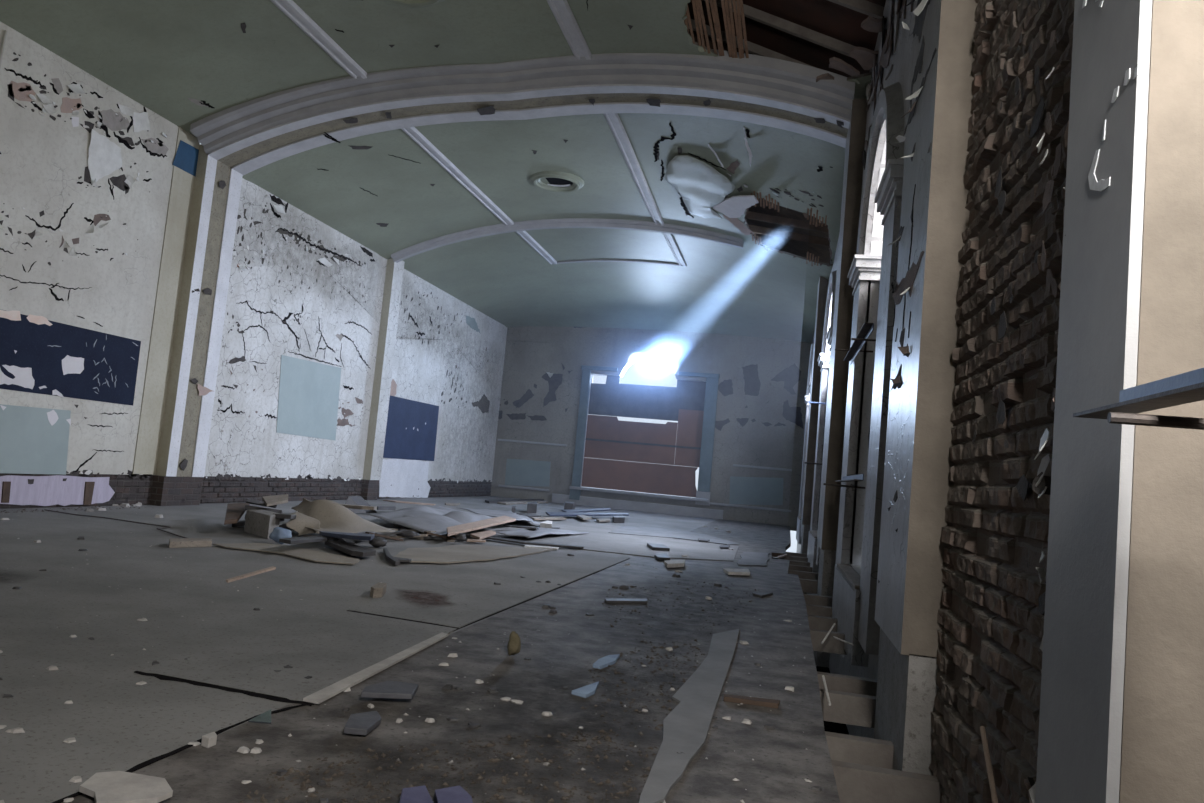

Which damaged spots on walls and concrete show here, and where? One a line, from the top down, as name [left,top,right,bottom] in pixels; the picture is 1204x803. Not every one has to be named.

peeling [862,0,937,170]
peeling [4,52,169,199]
flaking render [713,127,758,235]
crack [0,261,103,327]
peeling [0,203,128,265]
peeling [886,226,924,305]
crack [230,300,370,368]
peeling [715,363,803,431]
flaking render [1016,428,1052,501]
crack [347,558,630,631]
crack [125,671,314,773]
crack [52,792,83,803]